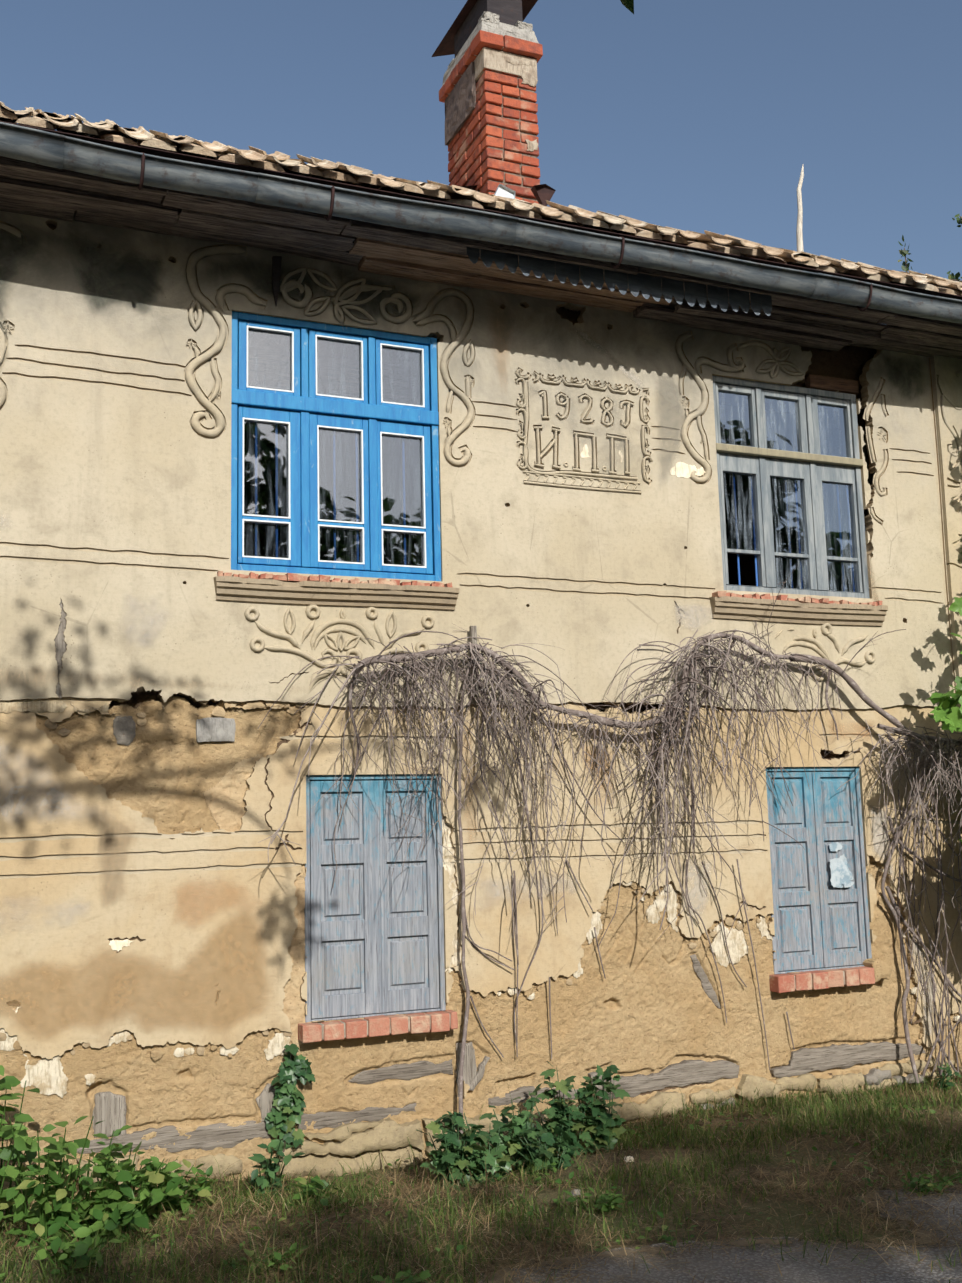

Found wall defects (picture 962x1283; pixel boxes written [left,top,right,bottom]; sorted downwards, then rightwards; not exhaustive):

spalling [54,601,67,699]
flaking render [24,695,304,839]
crack [264,722,312,850]
flaking render [0,816,962,1207]